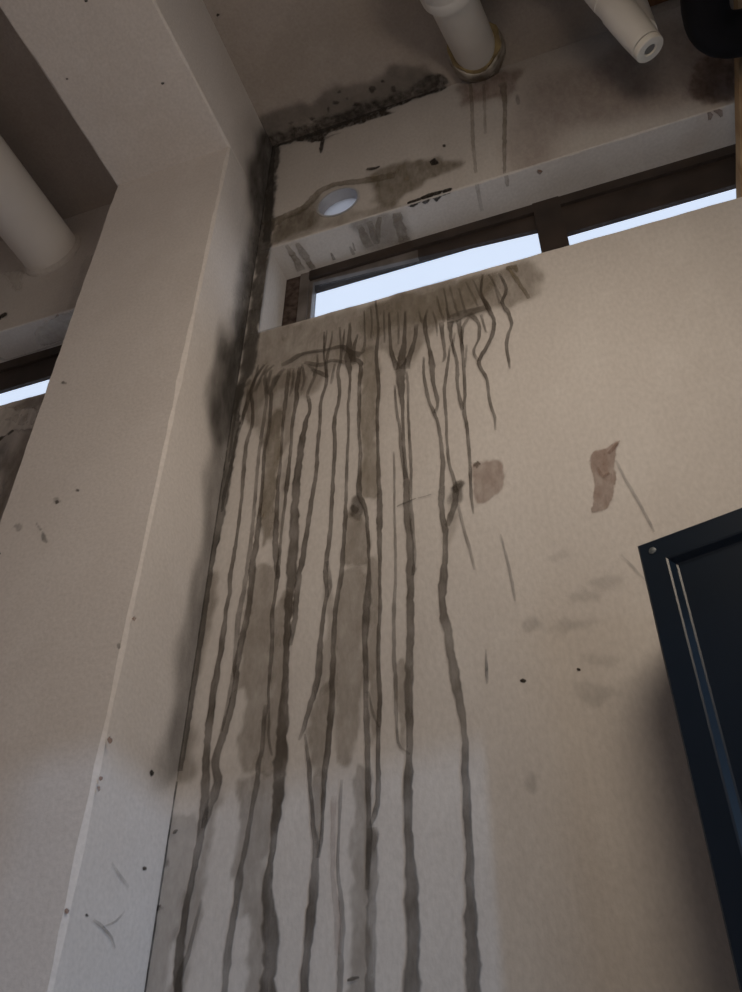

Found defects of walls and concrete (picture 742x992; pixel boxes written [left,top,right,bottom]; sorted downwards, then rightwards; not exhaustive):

water stain [173,854,200,992]
water stain [179,74,533,992]